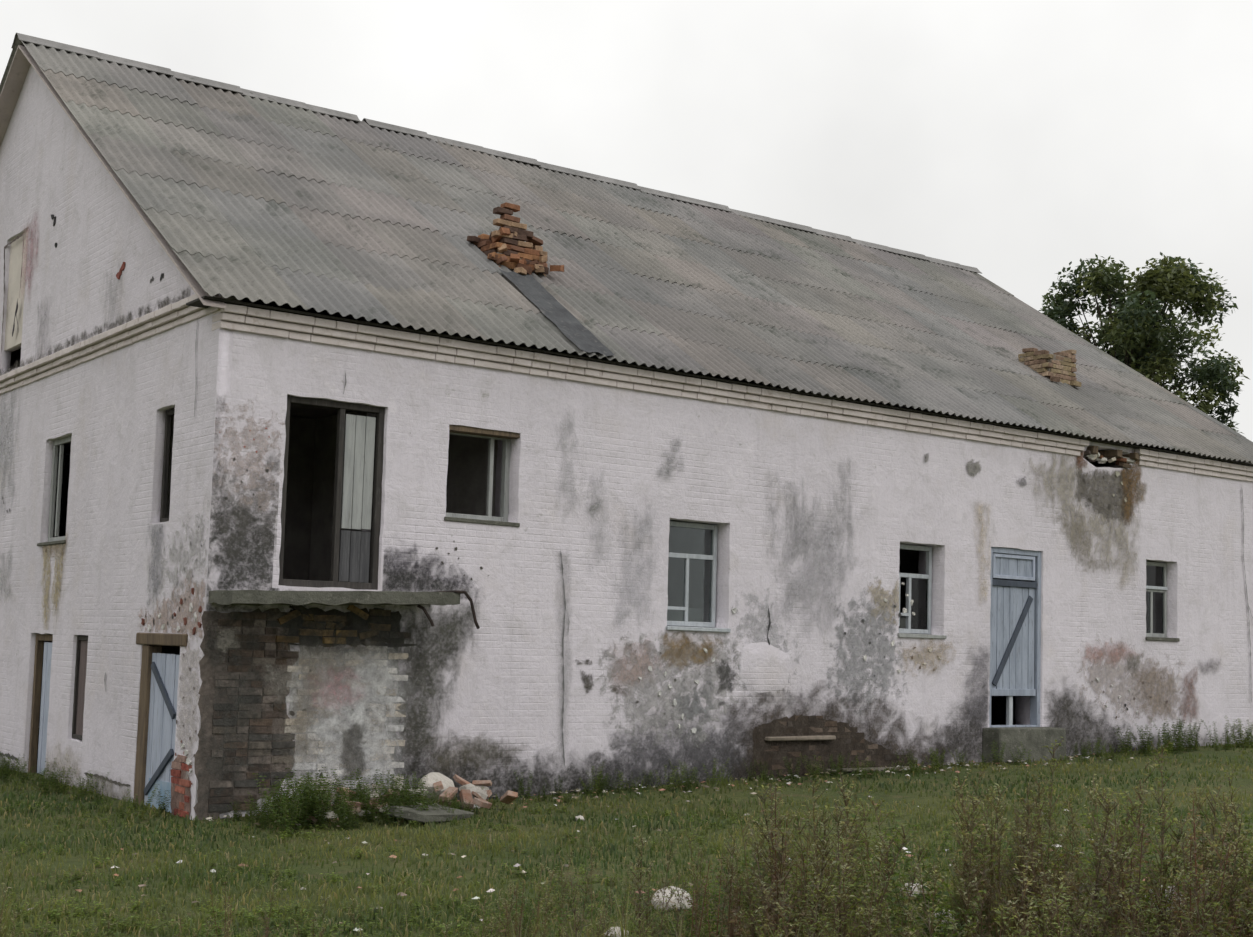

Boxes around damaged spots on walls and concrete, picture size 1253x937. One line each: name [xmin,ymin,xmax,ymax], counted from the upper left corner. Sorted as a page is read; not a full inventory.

damp [206,461,279,611]
damp [384,541,489,592]
damp [1035,455,1137,569]
spalling [1076,450,1134,521]
flaking render [139,515,416,820]
damp [394,606,751,801]
peeling [1080,638,1185,723]